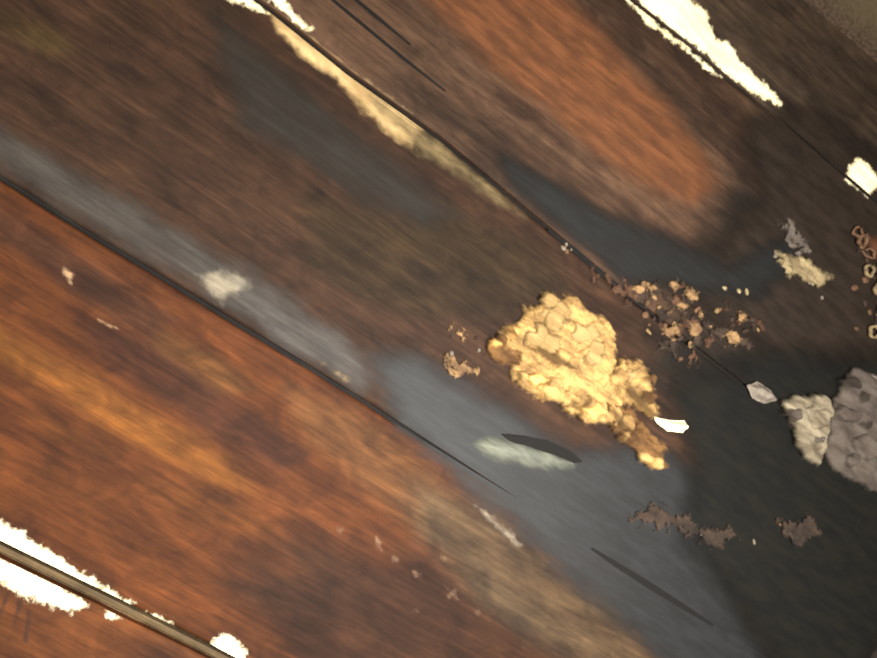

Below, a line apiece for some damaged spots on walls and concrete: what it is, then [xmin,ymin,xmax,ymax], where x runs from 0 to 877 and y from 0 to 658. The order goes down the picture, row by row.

crack [331,0,446,91]
peeling [626,0,782,106]
peeling [232,0,500,199]
peeling [845,158,877,196]
peeling [206,273,245,294]
spalling [591,268,766,364]
peeling [773,218,831,300]
peeling [850,226,877,347]
peeling [0,522,130,610]
peeling [213,636,245,658]